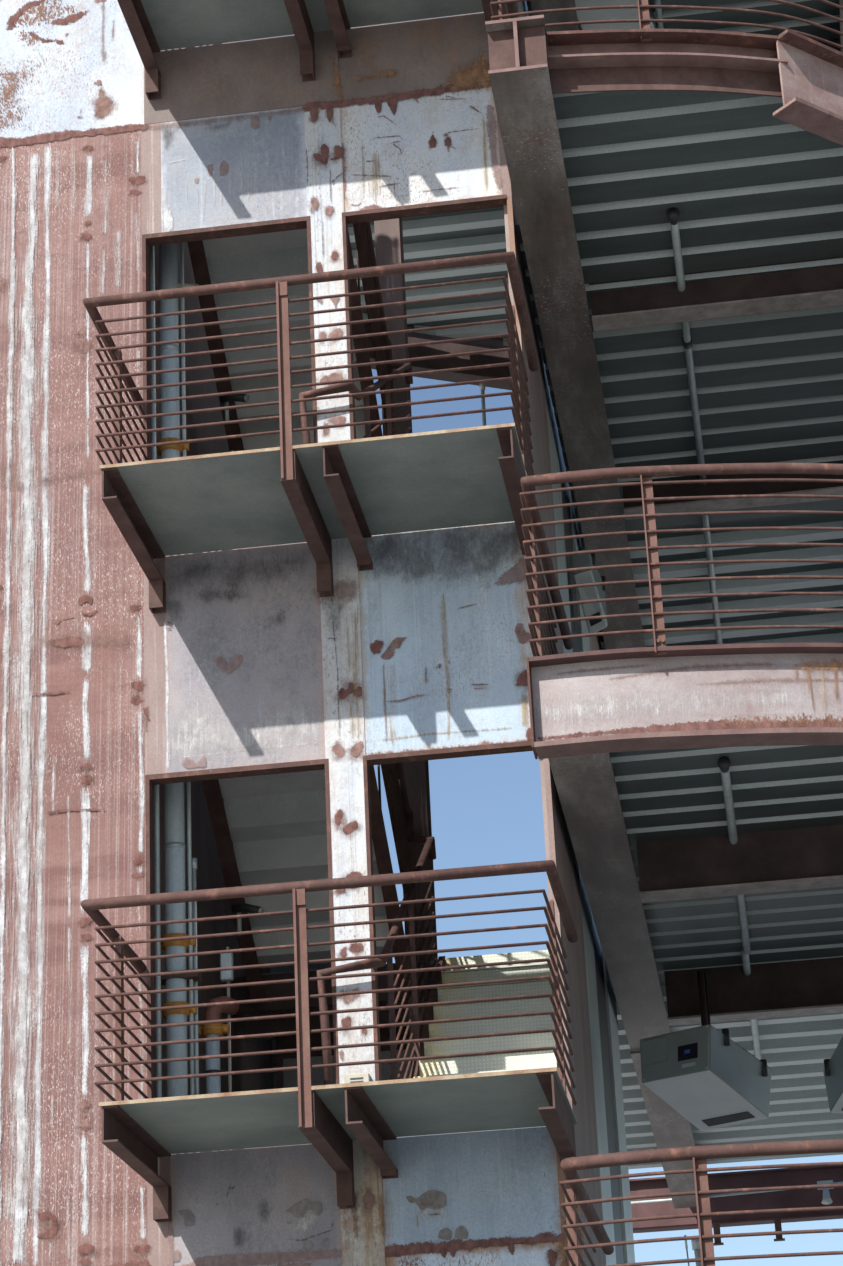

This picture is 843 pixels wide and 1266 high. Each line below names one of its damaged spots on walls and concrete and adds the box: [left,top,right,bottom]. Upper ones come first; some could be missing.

rust [0,0,491,162]
water stain [73,156,121,456]
water stain [0,147,91,1265]
rust [332,611,843,759]
water stain [137,711,145,852]
rust [334,809,358,835]
rust [338,943,363,957]
rust [37,1211,59,1239]
rust [78,1244,95,1265]
rust [110,1244,151,1266]
rust [183,1249,342,1266]
rust [350,1184,583,1266]